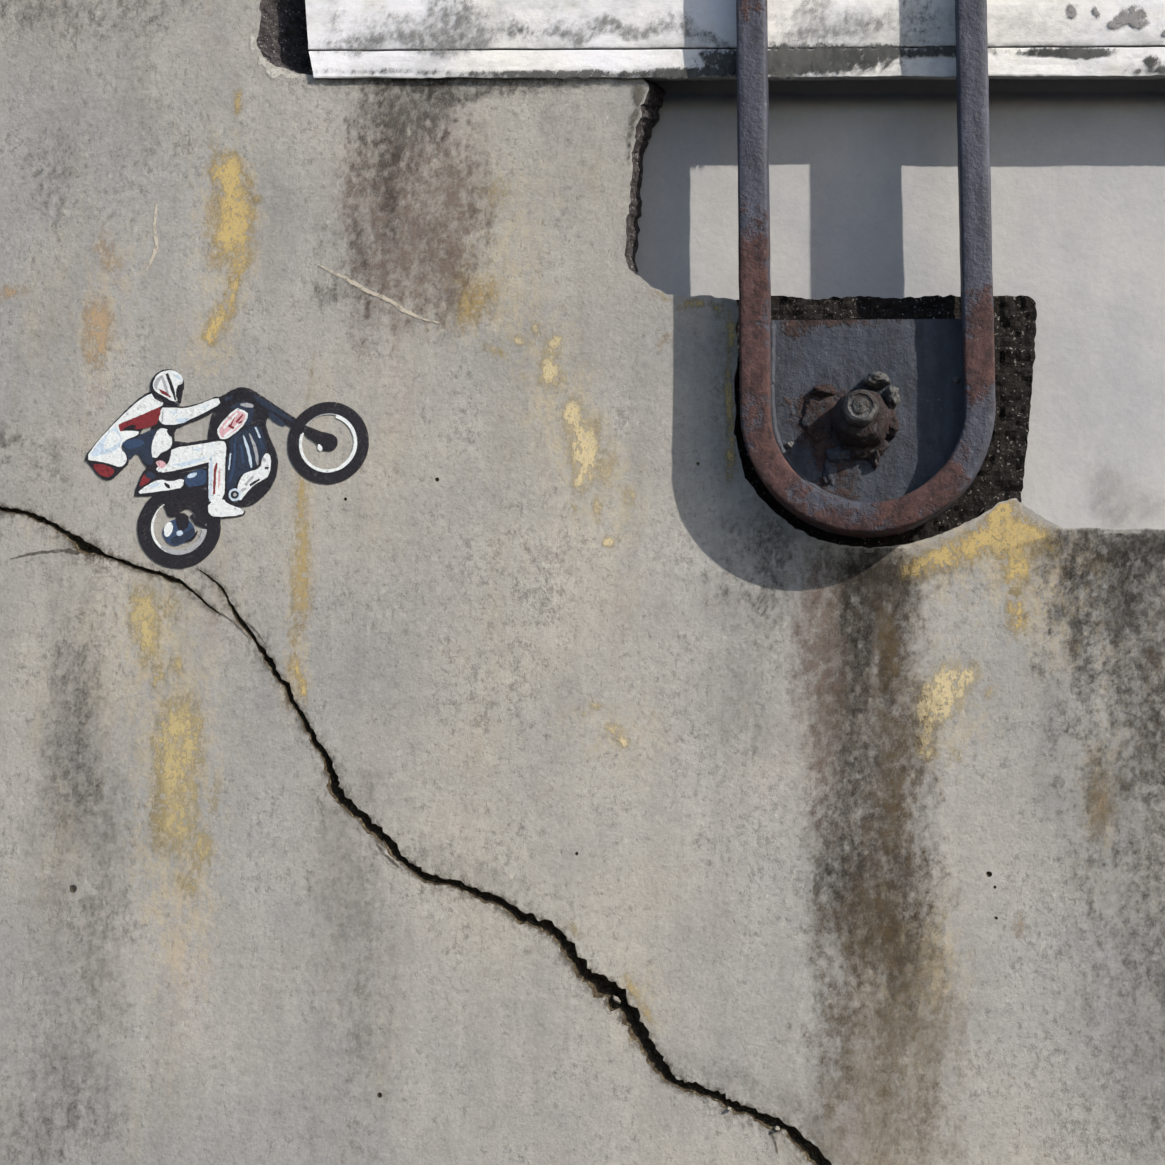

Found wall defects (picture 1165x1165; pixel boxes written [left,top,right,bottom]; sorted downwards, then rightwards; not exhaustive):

spalling [250,0,321,88]
water stain [768,0,956,78]
water stain [1020,47,1115,59]
water stain [344,14,737,330]
spalling [624,79,666,272]
peeling [514,321,566,388]
peeling [562,398,615,509]
peeling [684,298,735,479]
corrosion [800,371,901,470]
water stain [1058,531,1165,800]
crack [0,506,832,1165]
water stain [792,548,938,1119]